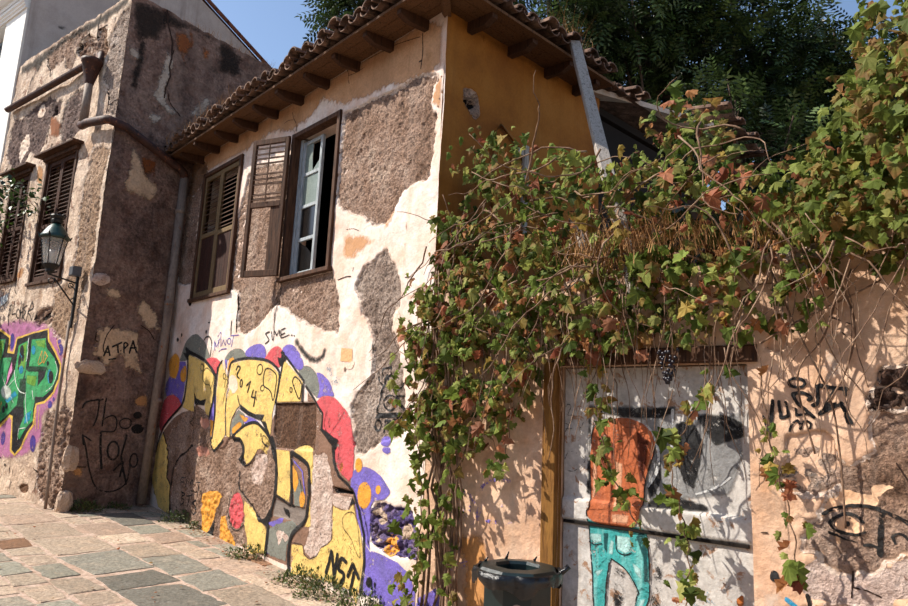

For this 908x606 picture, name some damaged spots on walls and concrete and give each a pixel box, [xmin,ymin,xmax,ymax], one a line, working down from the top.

peeling [149,55,176,123]
crack [164,9,180,116]
spalling [189,22,442,226]
spalling [231,163,340,335]
peeling [340,348,354,372]
spalling [351,249,406,457]
spalling [167,403,353,561]
spalling [774,364,908,606]